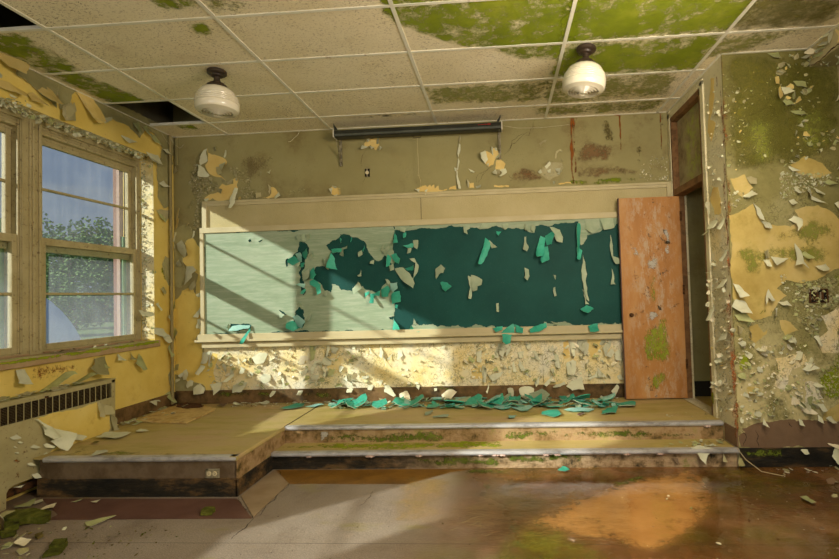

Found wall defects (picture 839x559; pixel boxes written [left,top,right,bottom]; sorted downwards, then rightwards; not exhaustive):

peeling [0,53,624,456]
peeling [703,28,839,466]
peeling [669,439,723,464]
peeling [0,498,56,520]
peeling [85,515,116,527]
peeling [1,533,31,556]